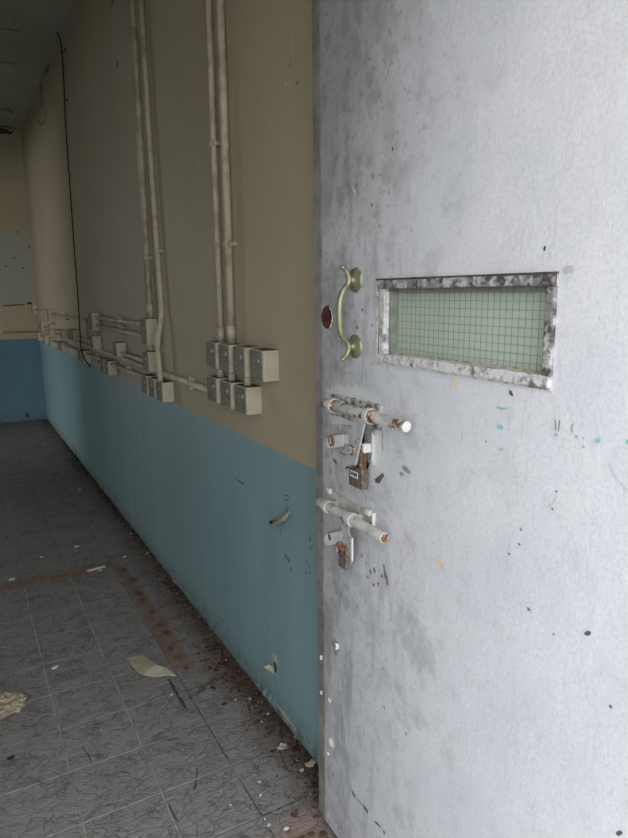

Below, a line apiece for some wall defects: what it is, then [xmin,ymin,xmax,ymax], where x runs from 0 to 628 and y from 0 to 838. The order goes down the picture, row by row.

peeling [263,651,297,732]